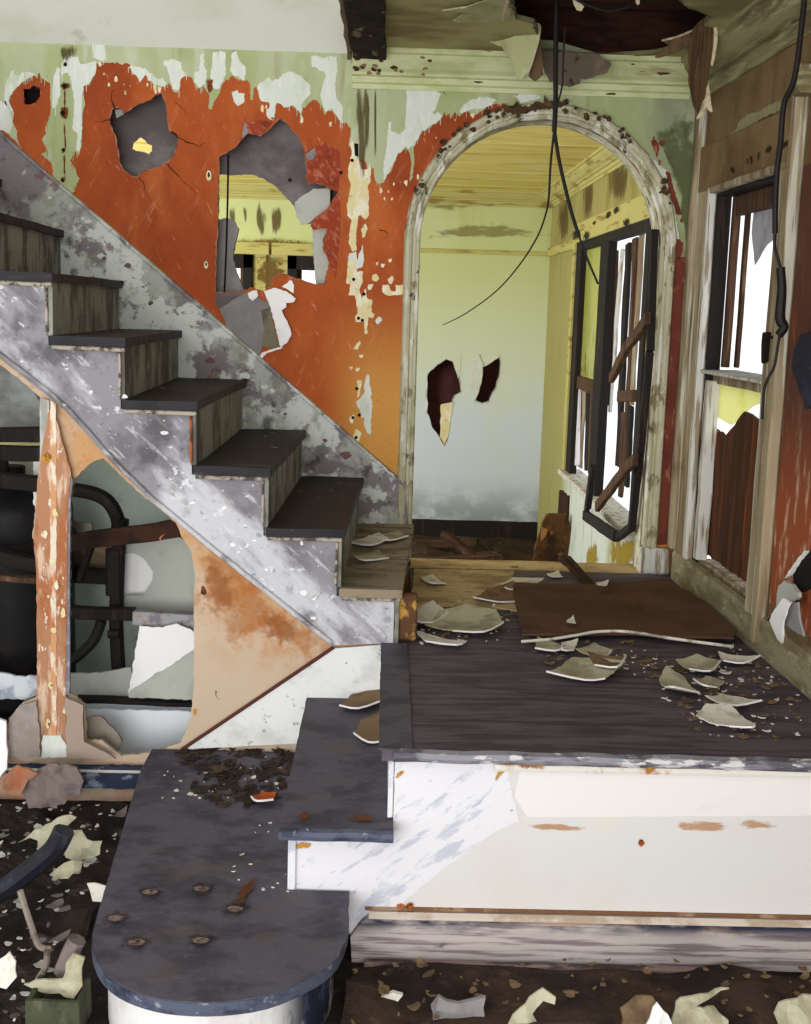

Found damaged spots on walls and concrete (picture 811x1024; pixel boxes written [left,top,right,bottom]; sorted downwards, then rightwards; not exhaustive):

peeling [541,40,592,52]
peeling [0,42,695,447]
peeling [311,432,352,460]
flaking render [785,550,811,592]
rust [679,822,722,831]